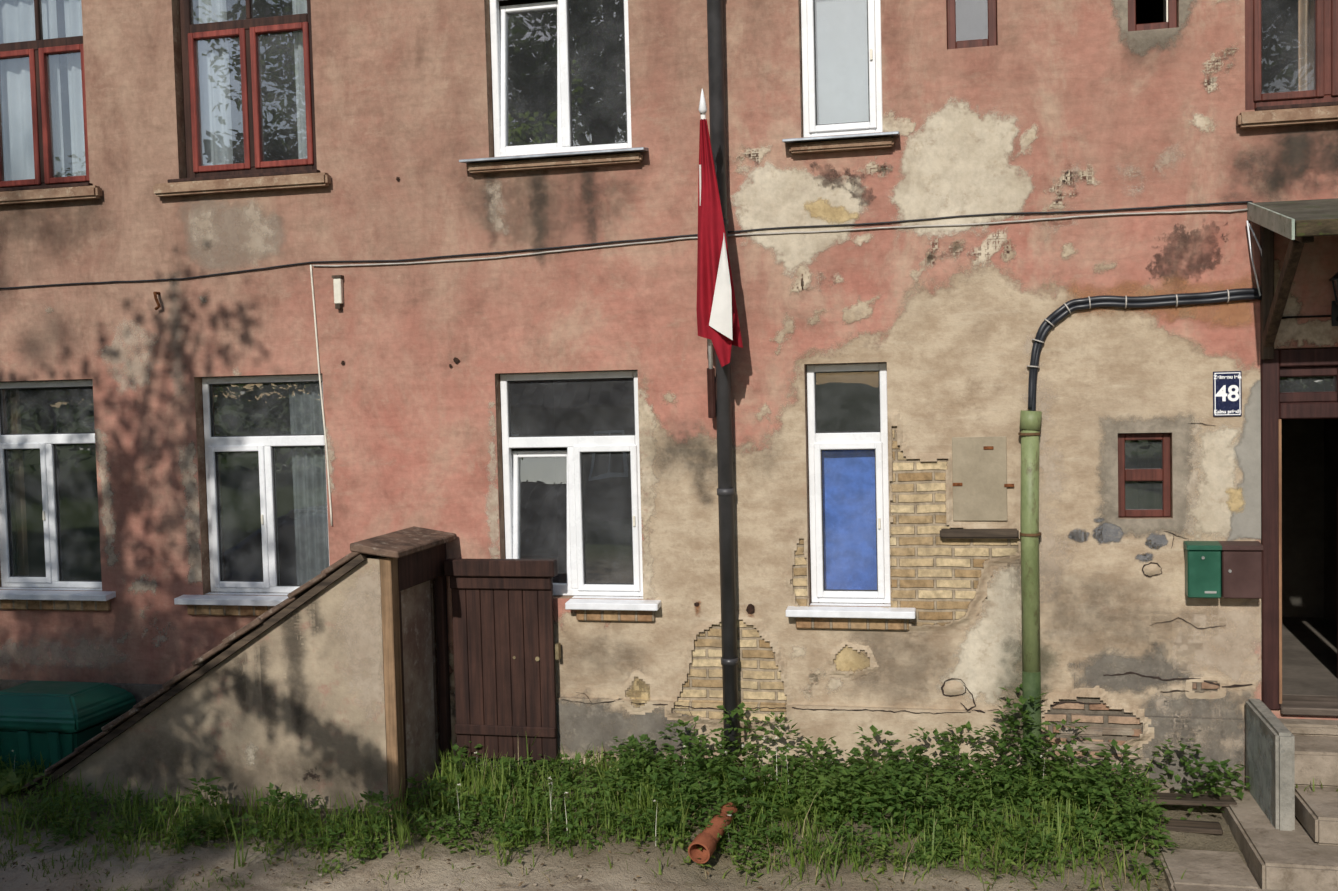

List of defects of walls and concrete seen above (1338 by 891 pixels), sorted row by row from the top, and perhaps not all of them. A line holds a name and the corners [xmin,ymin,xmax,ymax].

water stain [1146,223,1228,281]
peeling [531,97,1261,793]
water stain [286,614,304,725]
crack [1050,672,1252,707]